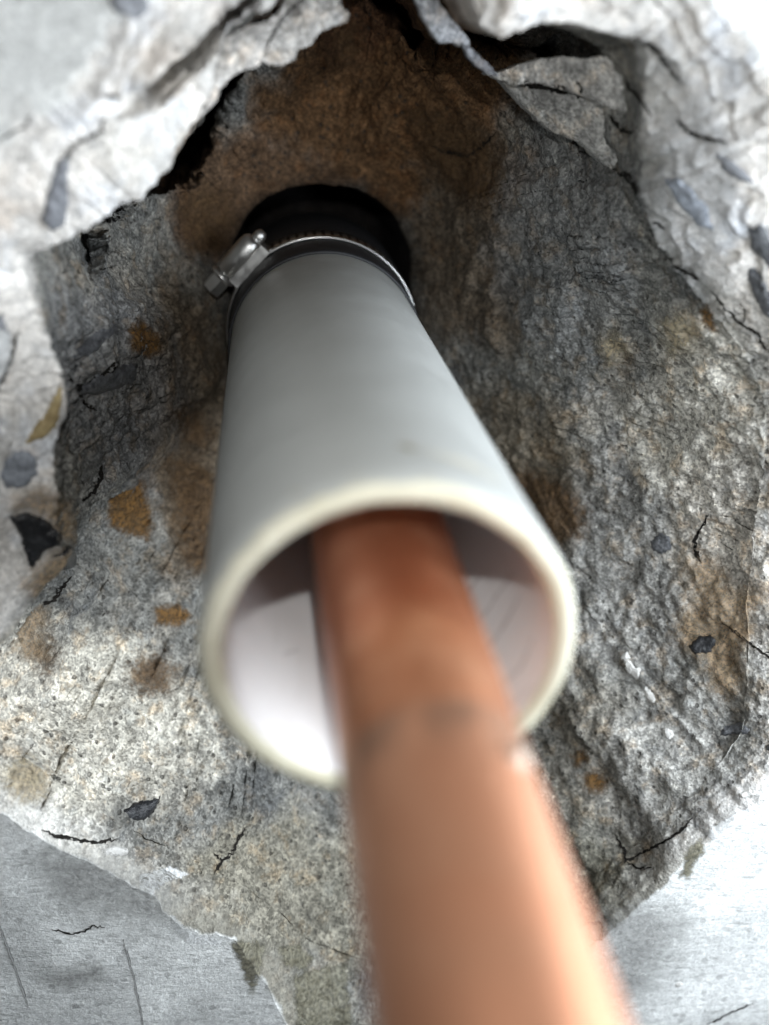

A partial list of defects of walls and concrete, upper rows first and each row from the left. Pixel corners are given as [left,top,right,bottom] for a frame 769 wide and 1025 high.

spalling [413,0,627,169]
rust [128,322,159,357]
spalling [0,0,349,643]
spalling [474,0,769,656]
rust [108,481,152,540]
rust [512,472,586,541]
crack [692,514,709,563]
rust [682,560,766,691]
crack [43,830,117,844]
spalling [0,744,372,1025]
crack [214,829,245,875]
crack [615,818,692,870]